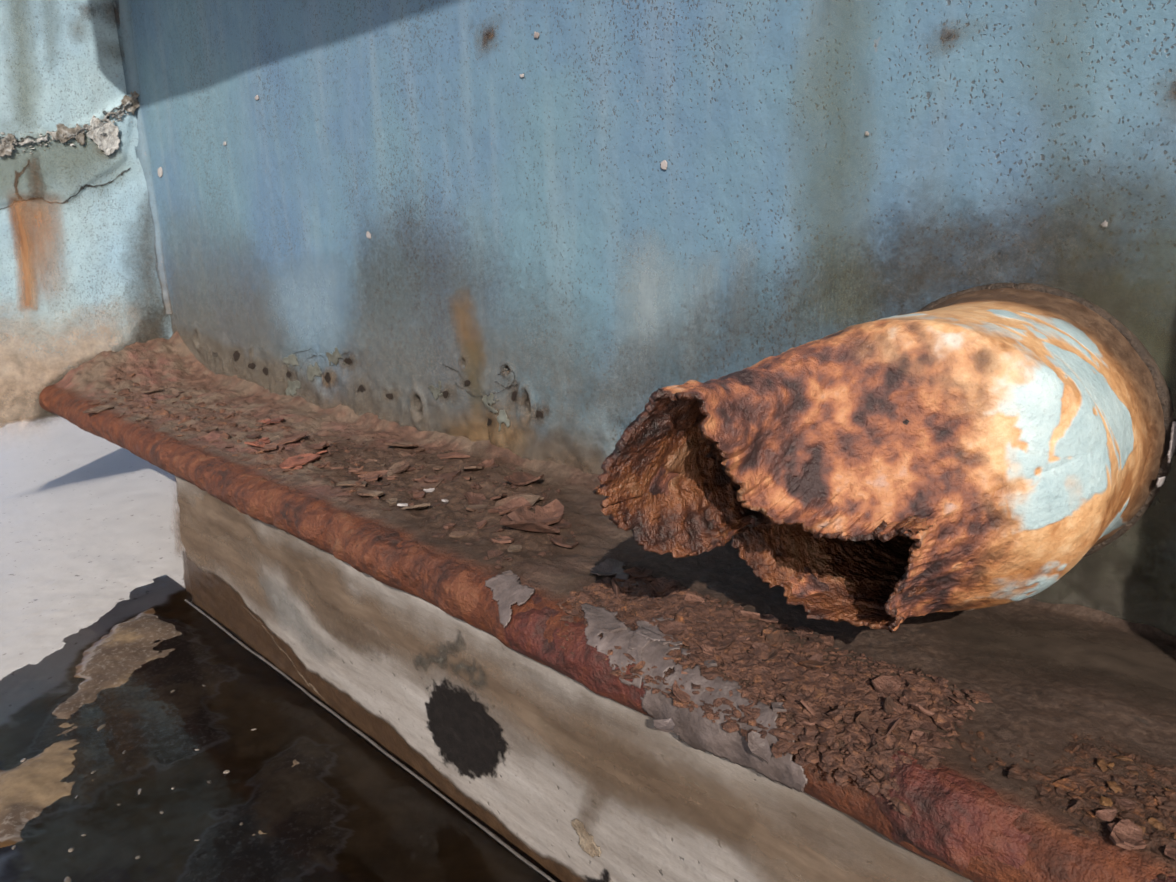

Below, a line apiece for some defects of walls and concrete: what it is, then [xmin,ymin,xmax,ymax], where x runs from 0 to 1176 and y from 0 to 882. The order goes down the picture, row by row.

corrosion [11,162,51,307]
crack [0,160,130,210]
water stain [134,214,302,398]
peeling [283,347,349,396]
water stain [336,295,587,454]
peeling [488,497,572,534]
peeling [485,570,535,628]
water stain [1030,558,1176,636]
water stain [177,490,974,882]
peeling [581,603,808,793]